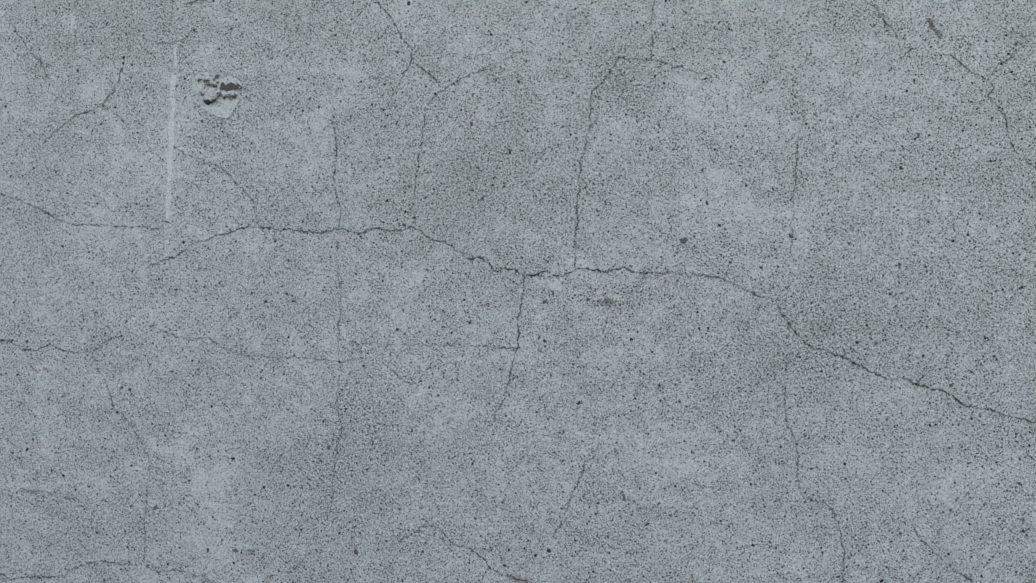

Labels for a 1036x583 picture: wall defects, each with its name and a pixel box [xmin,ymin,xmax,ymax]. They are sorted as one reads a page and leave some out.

peeling [194,80,240,123]
crack [151,0,1036,423]